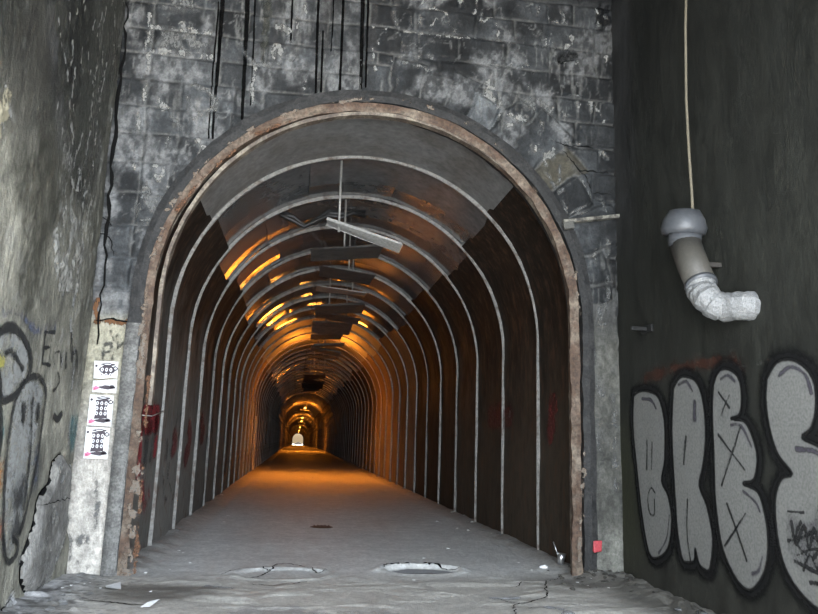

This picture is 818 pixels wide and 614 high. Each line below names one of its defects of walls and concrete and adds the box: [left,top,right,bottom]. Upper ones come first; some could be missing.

leakage [241,0,299,120]
leakage [303,0,345,93]
spalling [0,84,12,139]
crack [96,0,129,345]
crack [557,142,610,195]
crack [0,452,70,611]
crack [497,578,558,614]